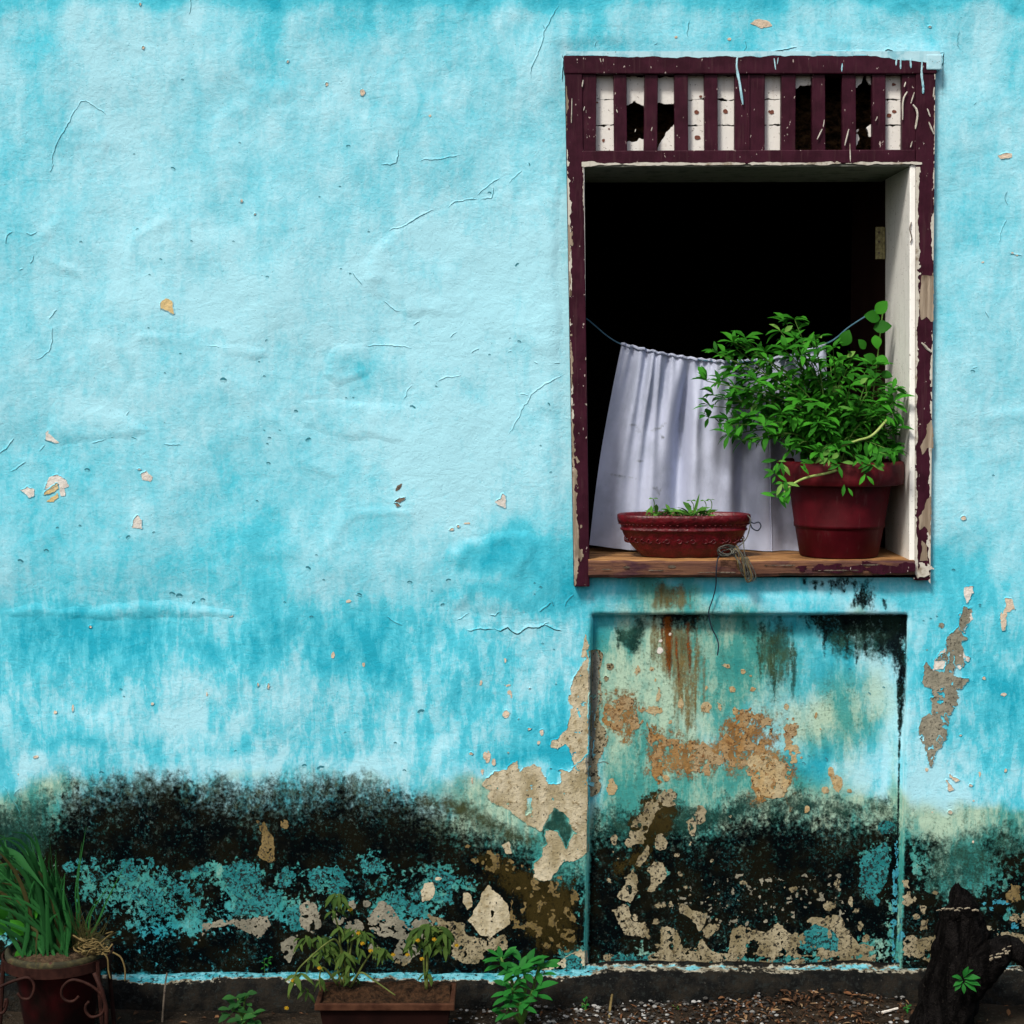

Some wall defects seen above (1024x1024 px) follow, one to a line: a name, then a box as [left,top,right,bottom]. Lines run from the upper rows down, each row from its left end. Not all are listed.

peeling [750,19,772,28]
peeling [159,298,175,316]
peeling [20,473,69,502]
crack [457,594,574,635]
rust [601,583,799,807]
peeling [917,585,987,772]
peeling [62,634,936,970]
water stain [0,577,1024,976]
peeling [945,772,981,802]